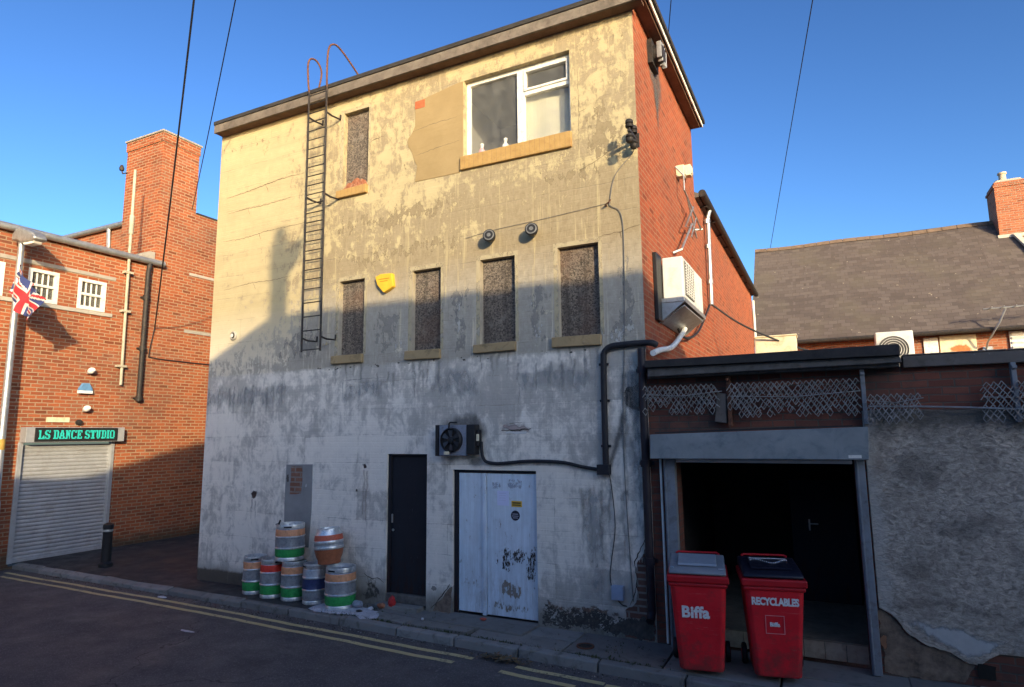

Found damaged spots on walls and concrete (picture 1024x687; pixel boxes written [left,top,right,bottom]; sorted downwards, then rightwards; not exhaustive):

peeling [540,103,628,184]
peeling [338,198,465,268]
peeling [451,286,489,361]
damp [610,373,640,464]
flaking render [878,607,996,683]